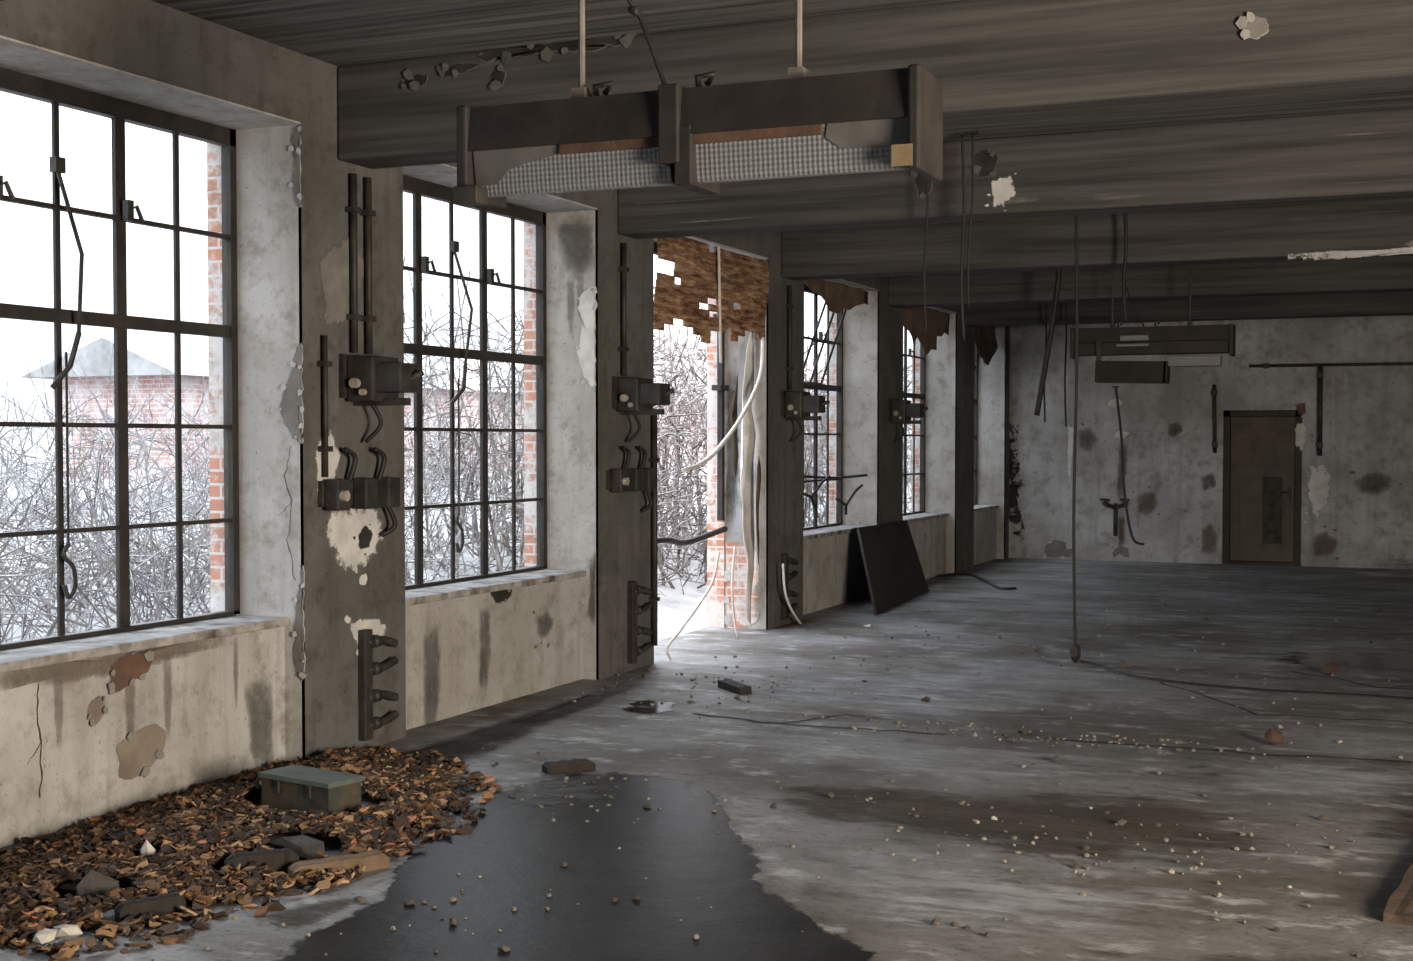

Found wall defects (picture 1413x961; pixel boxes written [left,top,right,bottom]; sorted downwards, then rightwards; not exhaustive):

flaking render [575,285,598,387]
flaking render [278,343,340,491]
peeling [327,506,383,585]